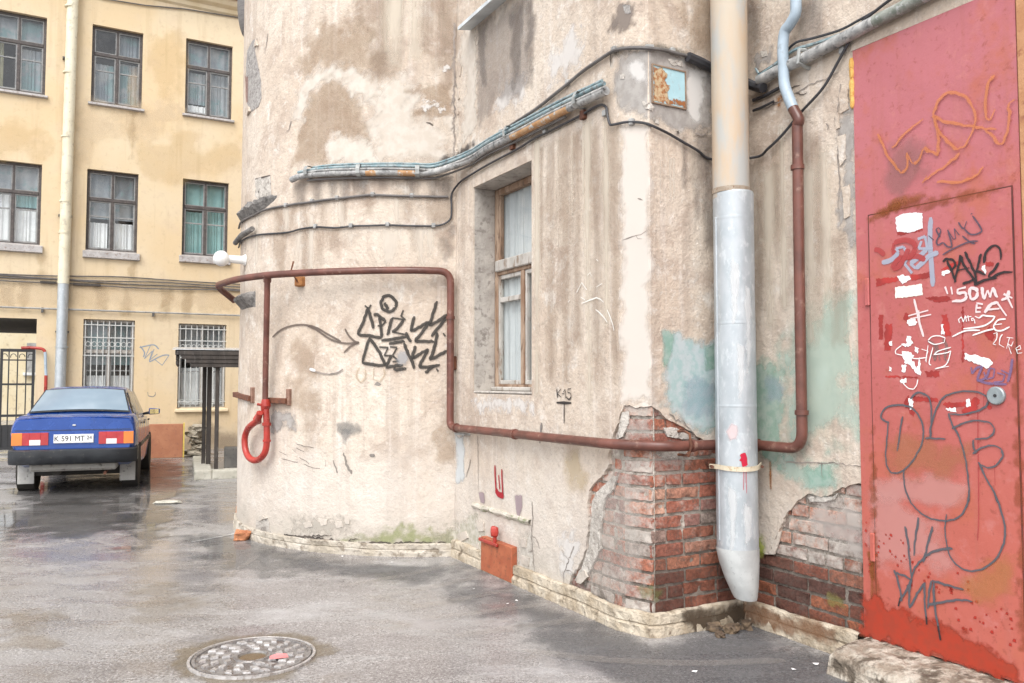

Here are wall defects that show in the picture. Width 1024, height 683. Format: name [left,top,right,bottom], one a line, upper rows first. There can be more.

flaking render [293,29,478,164]
rust [653,67,685,108]
flaking render [834,84,856,247]
flaking render [559,405,736,613]
flaking render [757,483,1019,683]